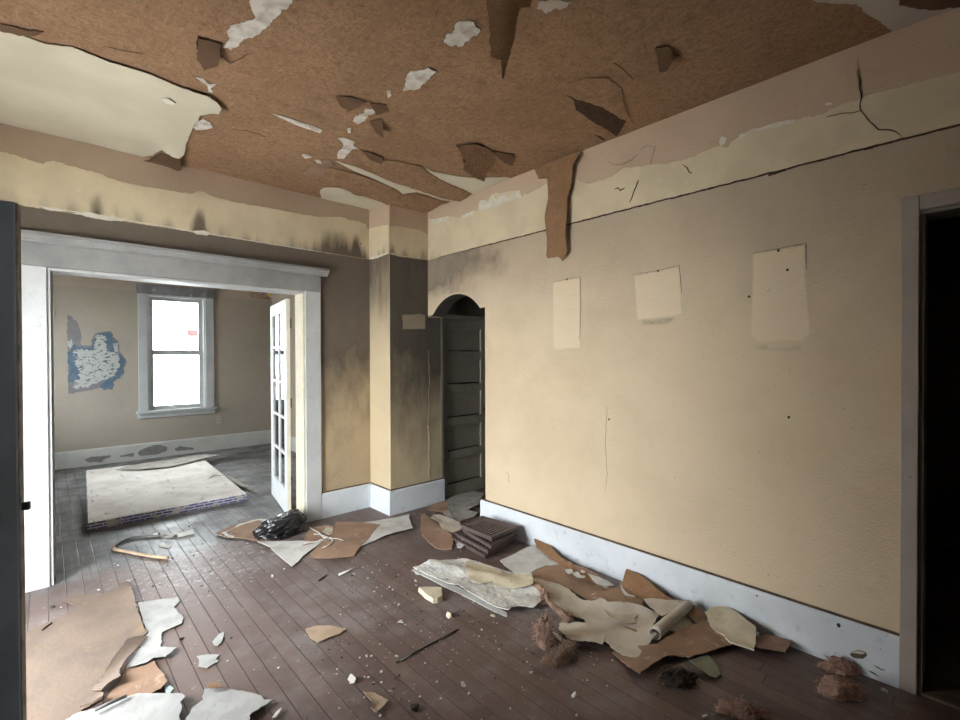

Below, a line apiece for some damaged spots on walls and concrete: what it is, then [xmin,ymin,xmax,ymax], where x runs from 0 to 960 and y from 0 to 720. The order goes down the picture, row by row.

flaking render [223,0,292,50]
flaking render [444,21,480,47]
flaking render [813,0,955,32]
flaking render [403,68,437,91]
flaking render [193,119,213,130]
flaking render [271,113,322,133]
flaking render [336,109,454,201]
crack [441,57,960,257]
peeling [566,72,960,224]
peeling [0,152,548,260]
peeling [67,315,127,394]
peeling [85,445,194,463]